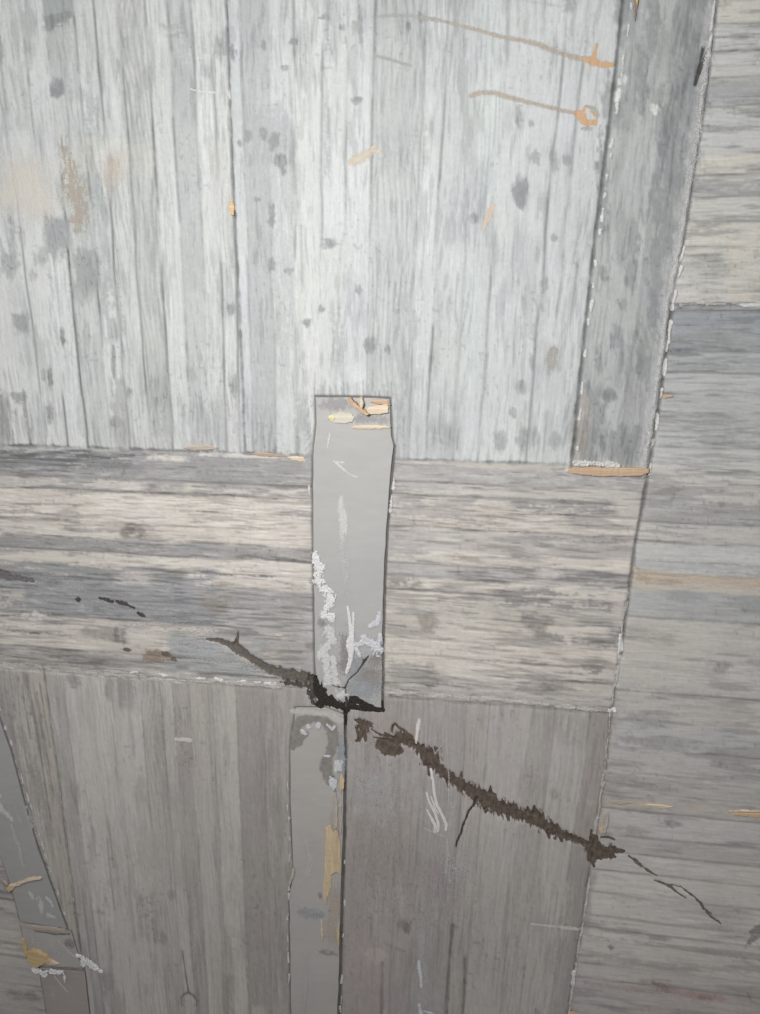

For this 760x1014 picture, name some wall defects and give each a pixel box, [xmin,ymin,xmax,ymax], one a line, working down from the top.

rust [375,13,615,69]
rust [469,88,599,131]
crack [0,569,34,583]
crack [75,597,146,617]
water stain [309,551,392,704]
crack [206,631,320,705]
crack [355,718,721,925]
crack [747,924,760,945]